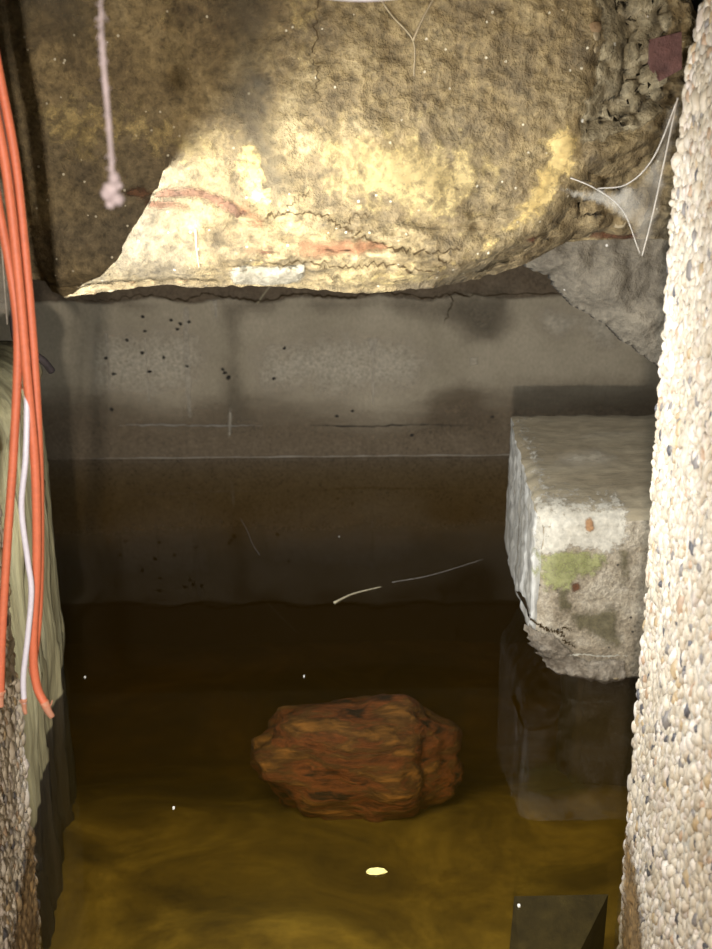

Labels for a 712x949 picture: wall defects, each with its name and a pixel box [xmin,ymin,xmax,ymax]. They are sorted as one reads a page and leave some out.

spalling [580,0,682,143]
rust [126,188,261,225]
rust [299,241,387,255]
leakage [32,265,560,332]
leakage [575,612,620,646]